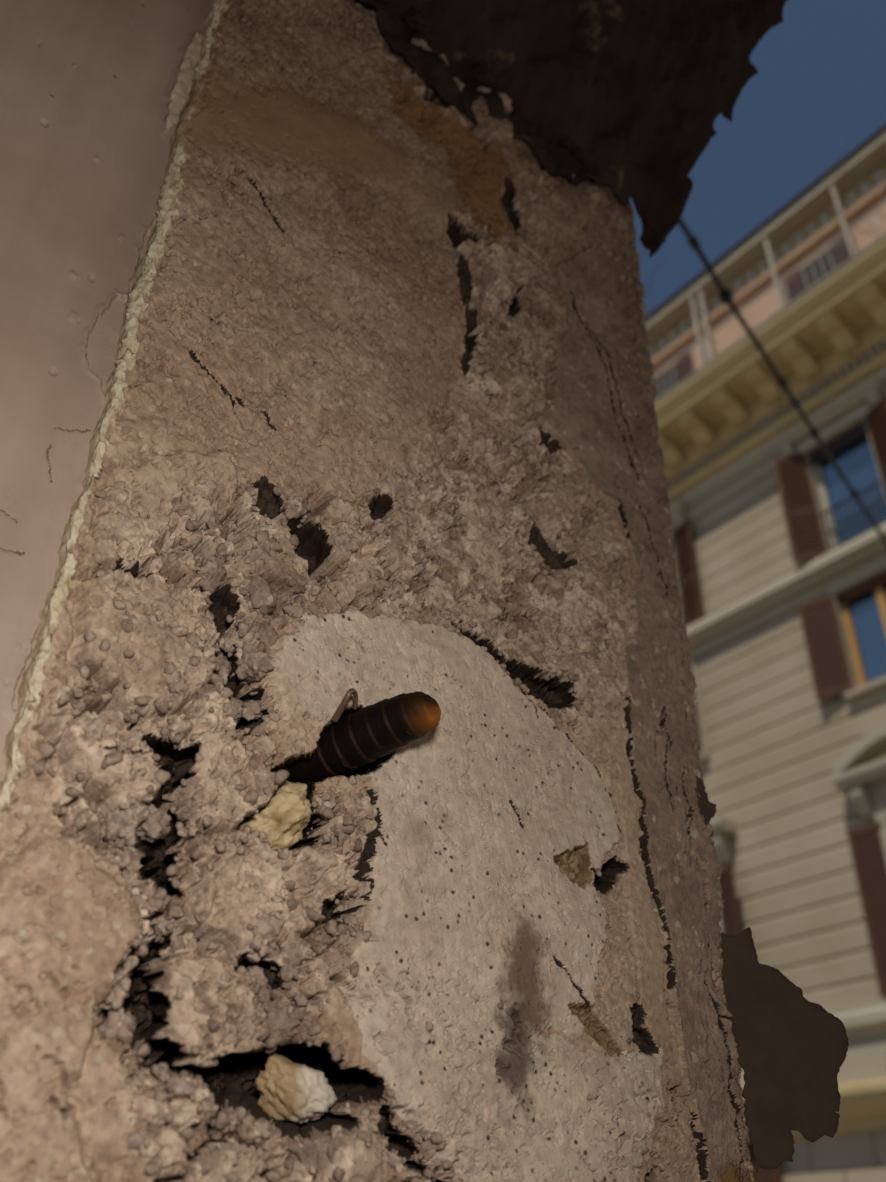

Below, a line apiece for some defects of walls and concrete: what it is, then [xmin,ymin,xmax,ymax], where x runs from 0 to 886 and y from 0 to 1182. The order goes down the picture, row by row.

peeling [165,31,204,132]
flaking render [355,0,788,258]
spalling [28,176,632,1182]
crack [353,787,388,902]
crack [496,661,744,1169]
spalling [568,1002,660,1057]
crack [691,1112,710,1182]